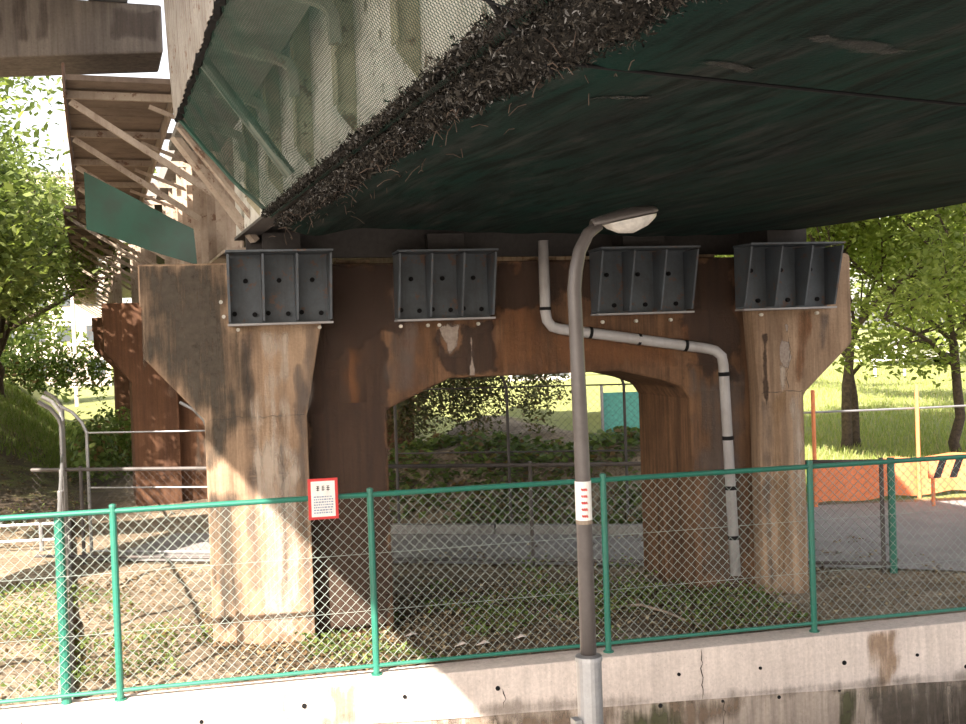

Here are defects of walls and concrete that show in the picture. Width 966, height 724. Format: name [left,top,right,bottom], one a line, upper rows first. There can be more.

crack [700,650,726,724]
damp [839,632,966,724]